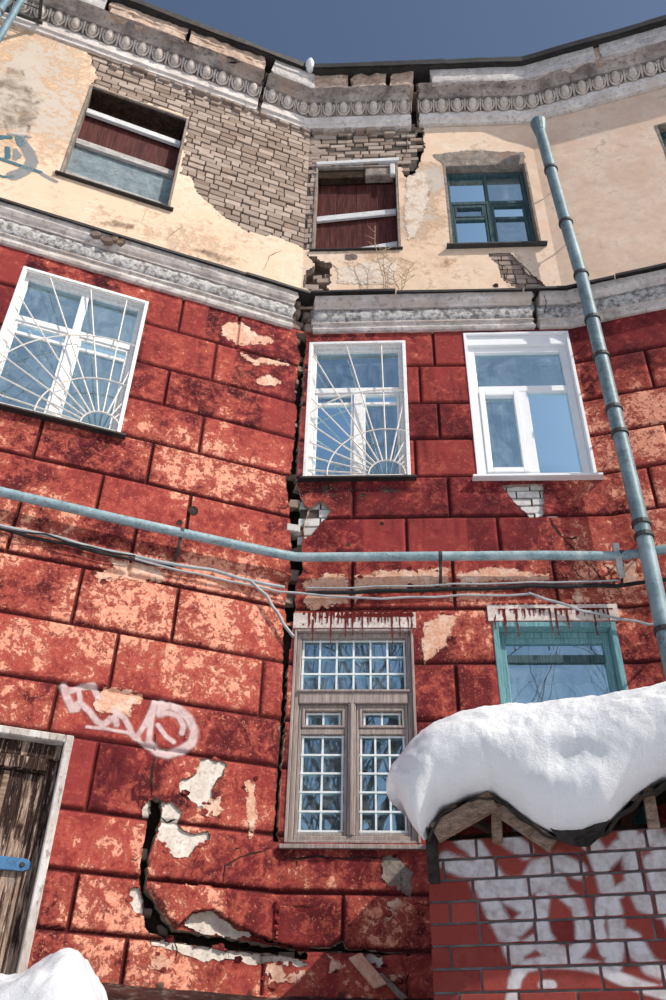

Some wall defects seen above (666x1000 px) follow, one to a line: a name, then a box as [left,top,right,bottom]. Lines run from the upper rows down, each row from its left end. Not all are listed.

flaking render [87,53,525,291]
peeling [219,322,290,386]
flaking render [297,493,336,548]
flaking render [502,484,558,517]
crack [223,333,381,881]
peeling [302,564,550,611]
peeling [421,612,457,665]
flaking render [179,756,227,816]
flaking render [141,796,210,859]
crack [131,733,410,996]
flaking render [126,888,144,916]
flaking render [147,911,307,990]